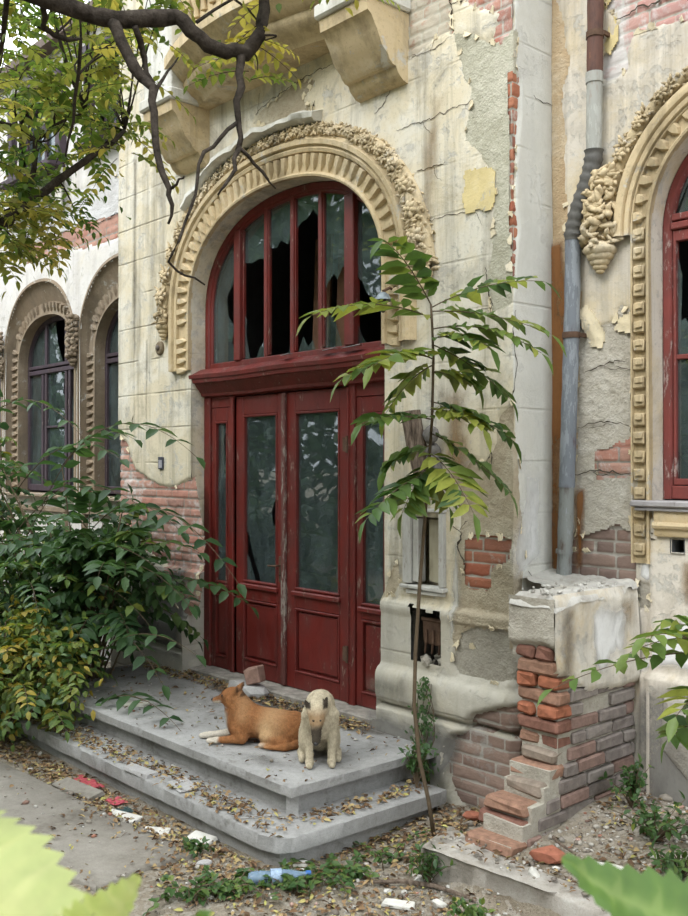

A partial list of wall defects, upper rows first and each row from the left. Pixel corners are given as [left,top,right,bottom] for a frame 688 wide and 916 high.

crack [616,0,661,20]
flaking render [603,0,688,81]
crack [397,99,472,134]
flaking render [407,0,520,312]
flaking render [551,0,570,277]
crack [586,360,629,372]
crack [575,468,630,476]
crack [582,421,631,433]
flaking render [572,291,652,613]
flaking render [119,435,206,616]
flaking render [413,401,527,685]
flaking render [450,706,522,808]